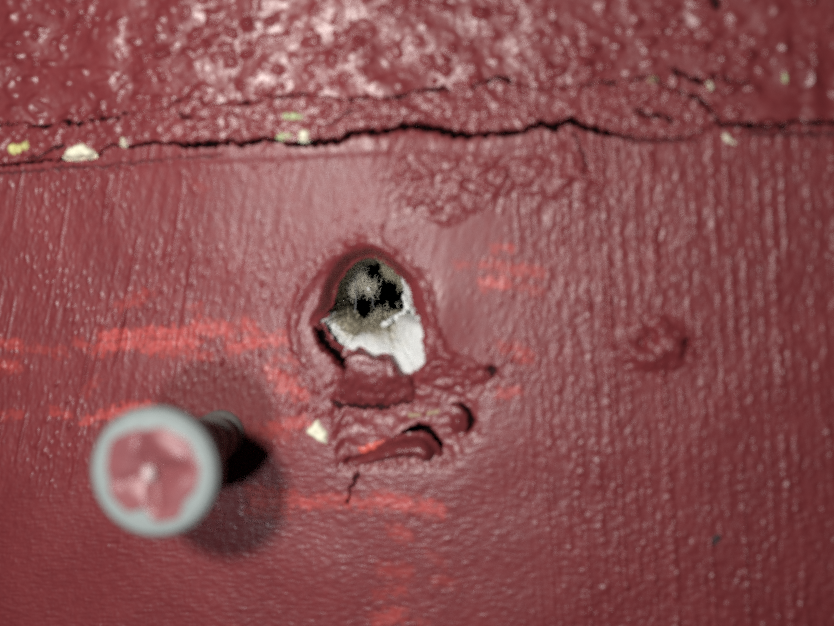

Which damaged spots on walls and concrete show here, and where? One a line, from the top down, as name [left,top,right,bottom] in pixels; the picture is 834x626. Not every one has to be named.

crack [0,85,634,167]
crack [470,75,512,89]
crack [561,67,834,138]
hole [349,263,404,319]
peeling [307,419,328,444]
spalling [346,410,443,466]